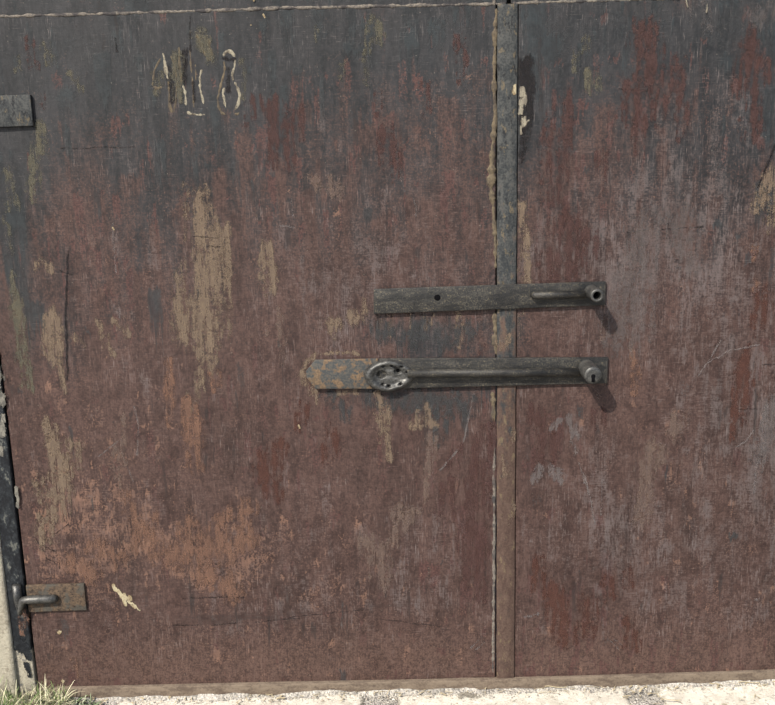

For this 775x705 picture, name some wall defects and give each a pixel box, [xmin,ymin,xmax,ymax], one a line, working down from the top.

peeling [163,183,234,474]
corrosion [728,284,774,444]
peeling [32,416,83,552]
peeling [58,413,260,606]
peeling [112,584,141,611]
corrosion [531,554,634,648]